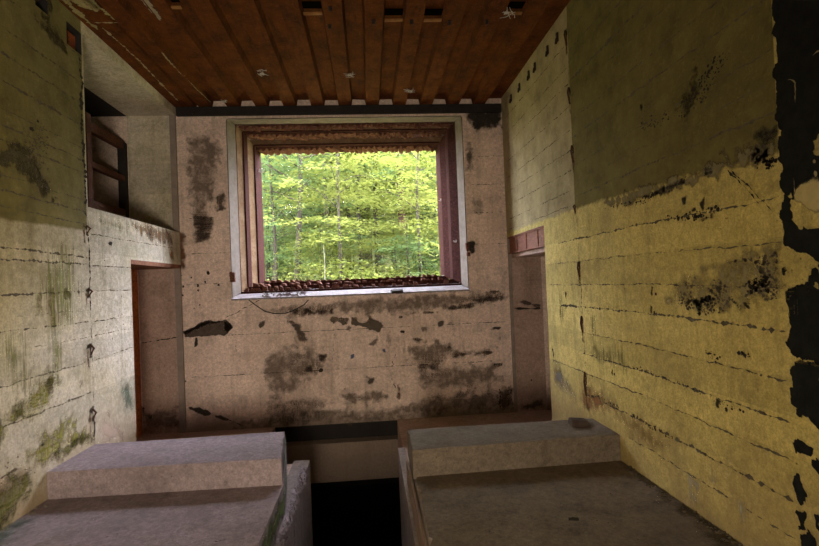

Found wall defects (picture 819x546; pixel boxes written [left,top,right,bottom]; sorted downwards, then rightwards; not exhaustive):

peeling [605,0,819,430]
spalling [183,320,233,347]
damp [242,291,512,427]
peeling [792,438,819,546]